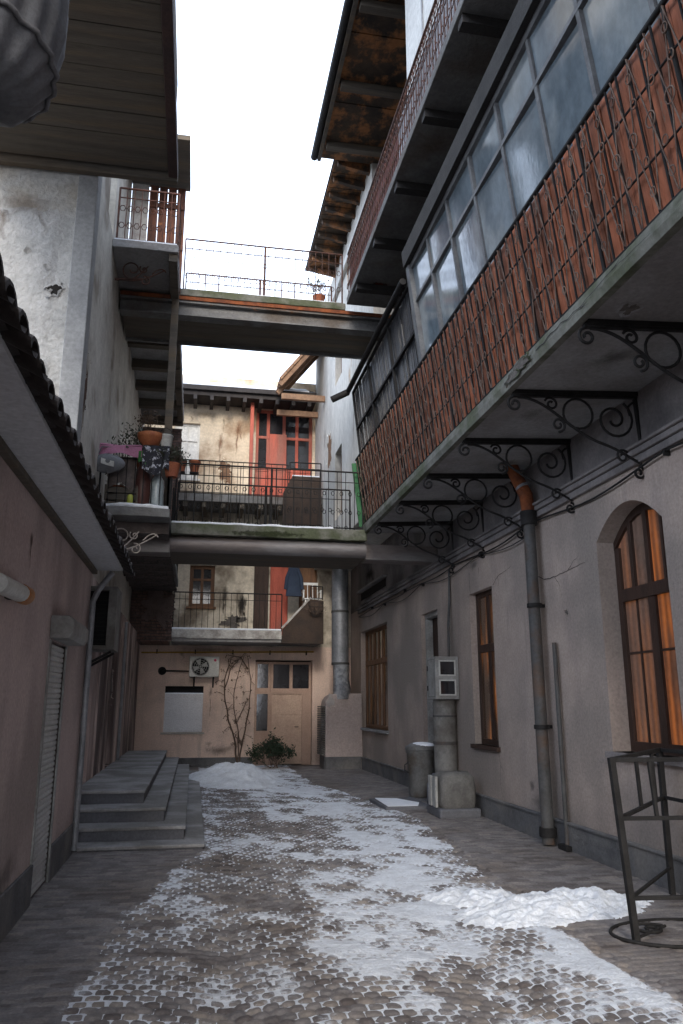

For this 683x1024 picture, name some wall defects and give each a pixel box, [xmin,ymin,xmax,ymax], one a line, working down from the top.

peeling [0,206,65,375]